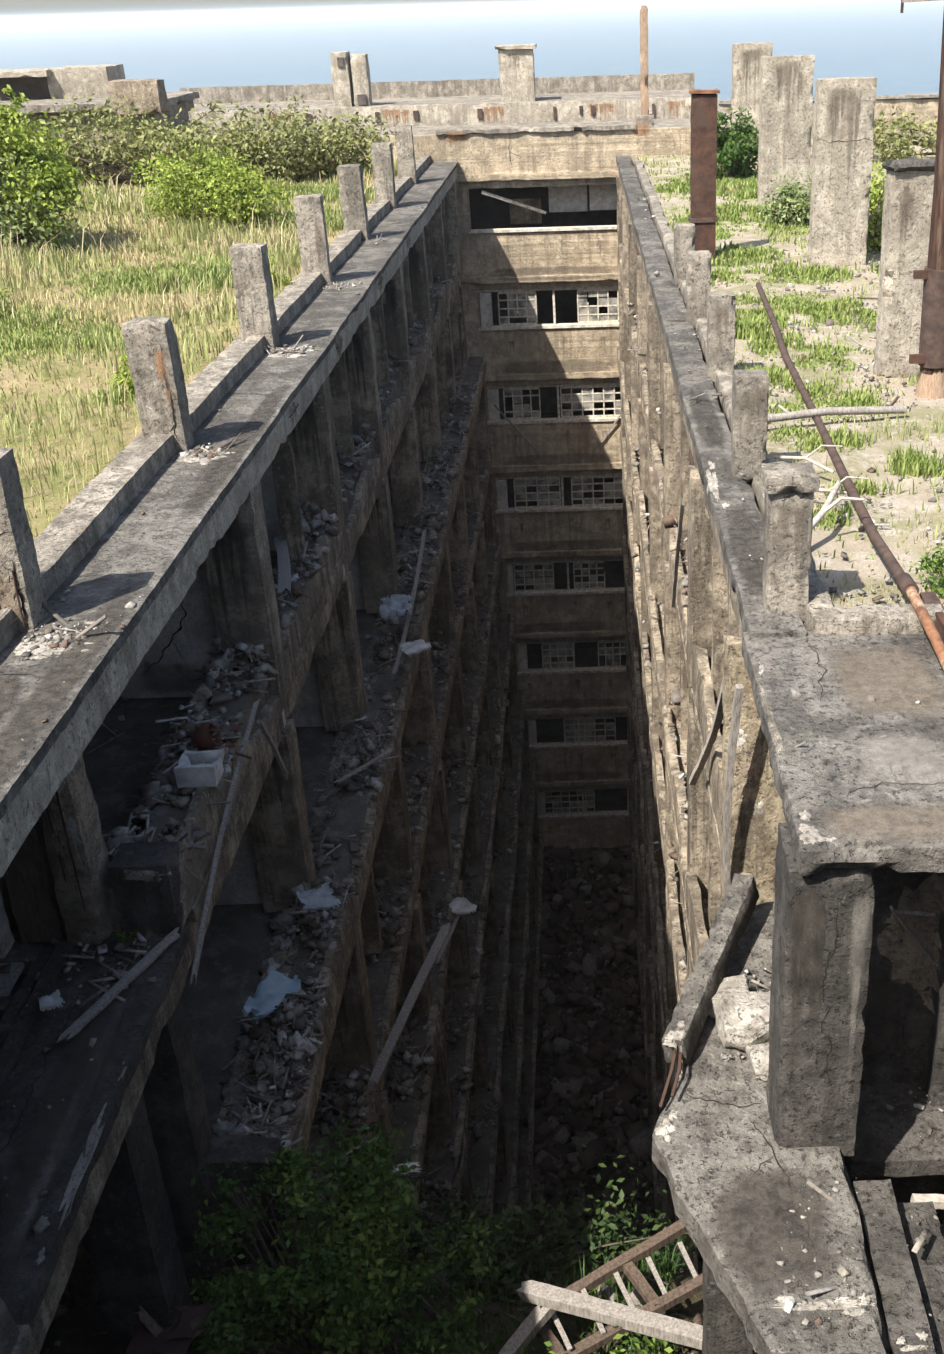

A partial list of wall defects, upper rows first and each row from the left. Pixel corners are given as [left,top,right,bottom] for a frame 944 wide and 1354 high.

crack [0,532,28,621]
crack [821,902,839,1097]
peeling [877,873,944,1014]
crack [684,1093,790,1180]